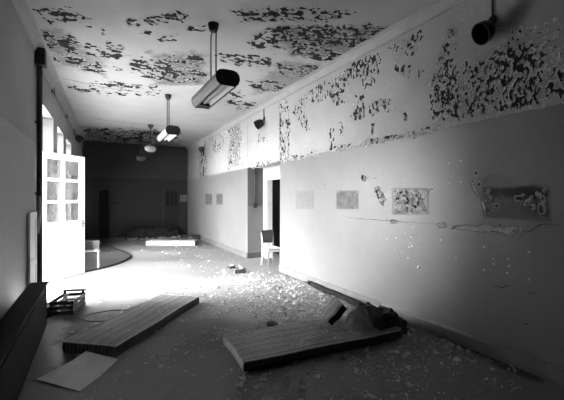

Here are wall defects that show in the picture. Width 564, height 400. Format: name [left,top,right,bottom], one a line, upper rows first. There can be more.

peeling [33,5,93,28]
peeling [126,10,208,36]
peeling [214,3,387,77]
peeling [41,28,209,97]
peeling [246,17,564,169]
peeling [83,127,181,144]
peeling [373,177,387,206]
peeling [390,190,427,224]
peeling [514,186,548,214]